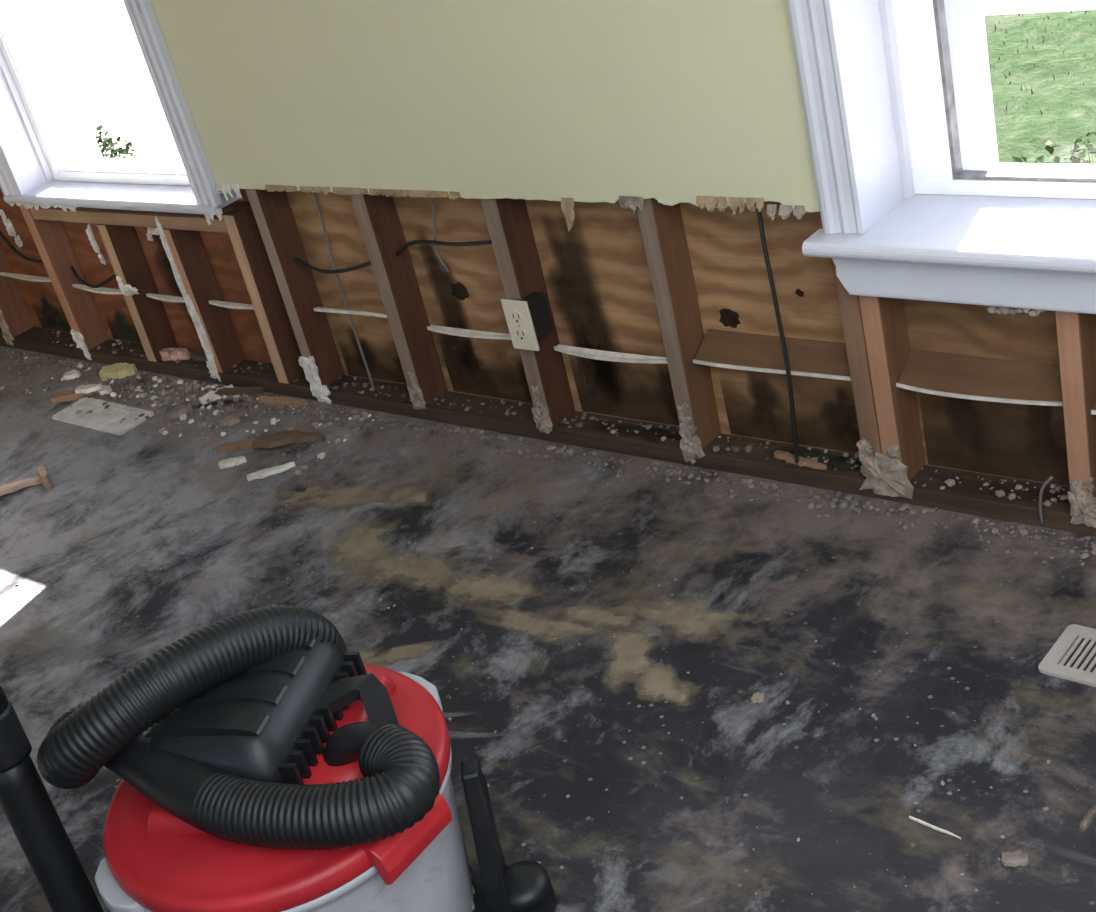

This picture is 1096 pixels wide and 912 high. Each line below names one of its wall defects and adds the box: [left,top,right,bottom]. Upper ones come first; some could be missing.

peeling [275,185,460,199]
peeling [85,223,106,265]
peeling [116,275,139,296]
peeling [146,216,221,382]
peeling [70,329,92,360]
damp [425,248,533,403]
damp [550,230,682,440]
peeling [298,356,332,404]
peeling [531,385,553,434]
peeling [677,403,705,465]
peeling [856,439,914,499]
peeling [1068,476,1096,528]